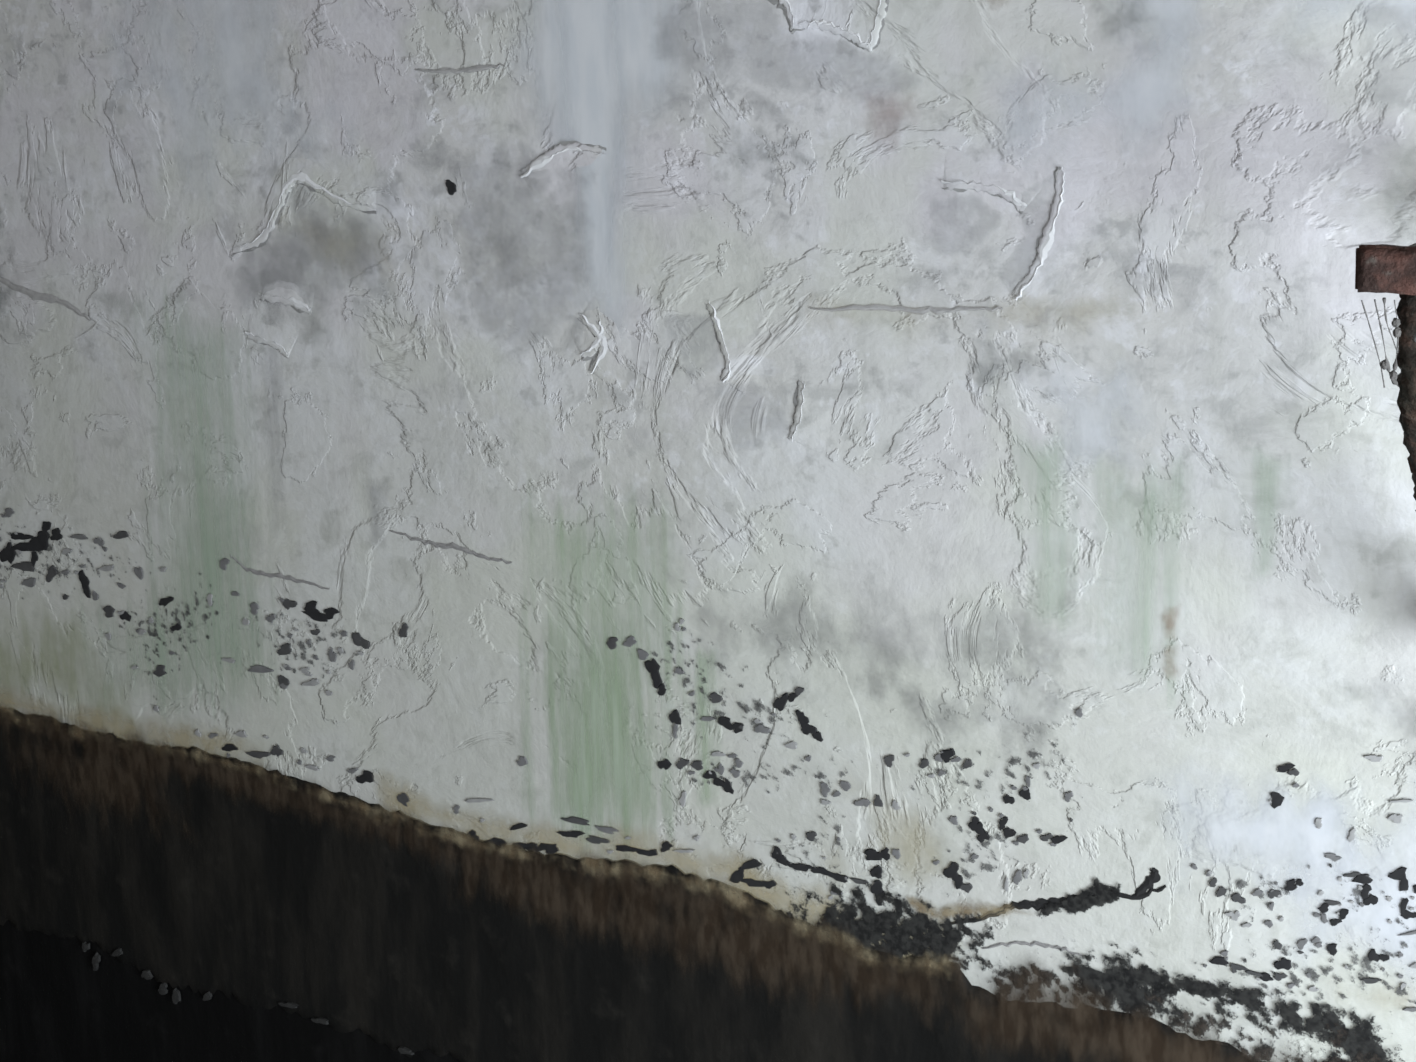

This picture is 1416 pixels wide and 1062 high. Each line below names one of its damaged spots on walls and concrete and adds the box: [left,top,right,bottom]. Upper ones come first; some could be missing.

peeling [768,0,889,52]
peeling [229,148,377,257]
peeling [245,267,314,358]
water stain [0,694,262,775]
water stain [442,825,529,861]
water stain [540,833,884,965]
water stain [909,898,1010,918]